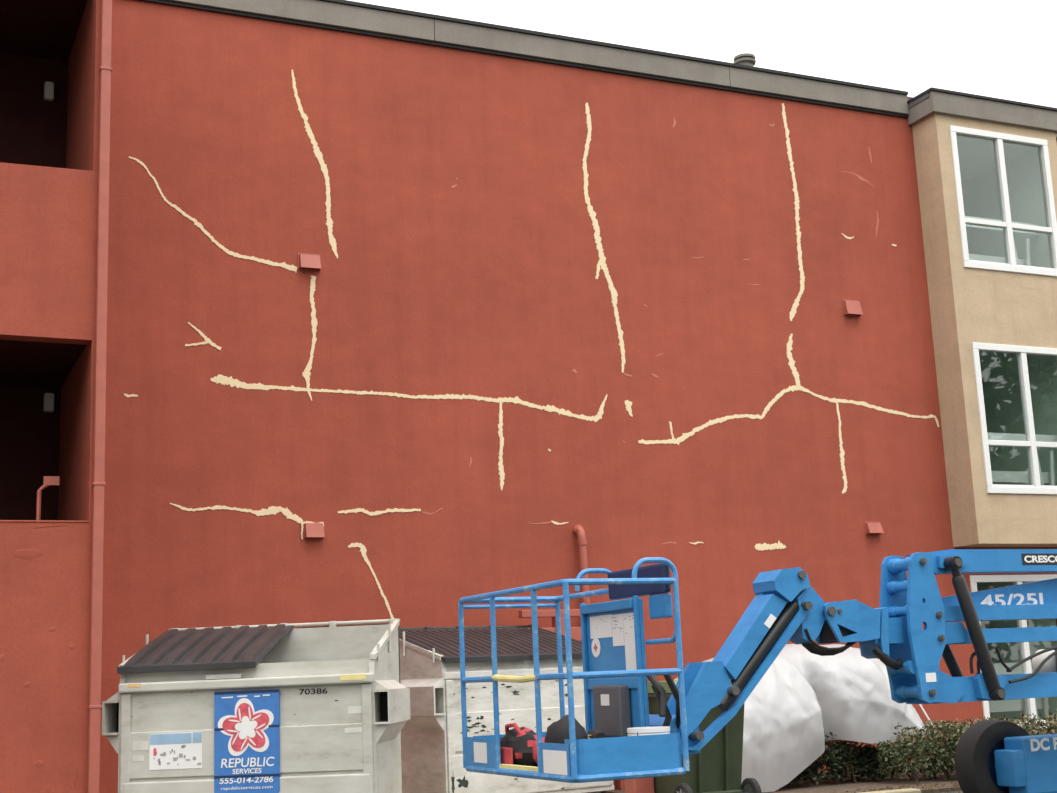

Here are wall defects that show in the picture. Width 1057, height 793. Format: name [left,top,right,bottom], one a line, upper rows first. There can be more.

crack [291,70,338,259]
crack [128,156,607,490]
crack [582,103,626,373]
crack [638,103,939,494]
crack [170,503,443,539]
crack [348,543,394,618]